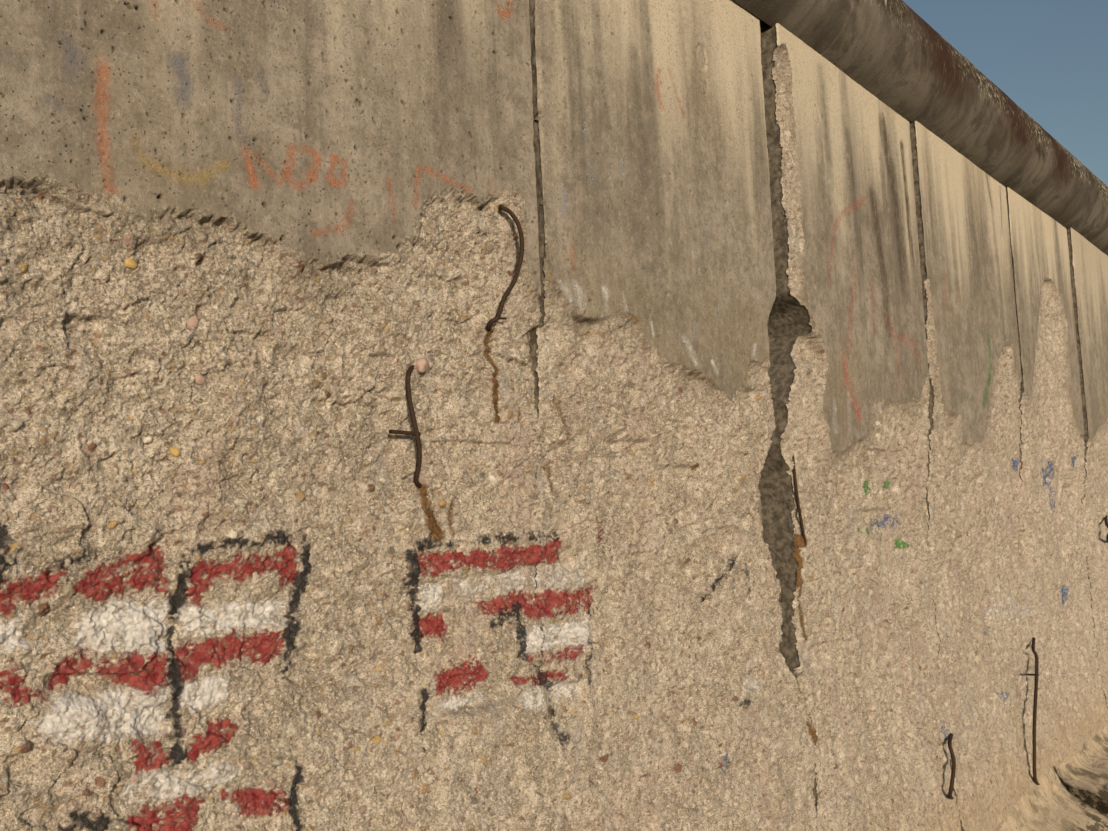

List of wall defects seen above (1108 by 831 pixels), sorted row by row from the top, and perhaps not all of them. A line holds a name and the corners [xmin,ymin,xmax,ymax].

spalling [0,172,551,831]
rust [418,485,453,542]
rust [483,327,500,423]
spalling [534,43,1108,831]